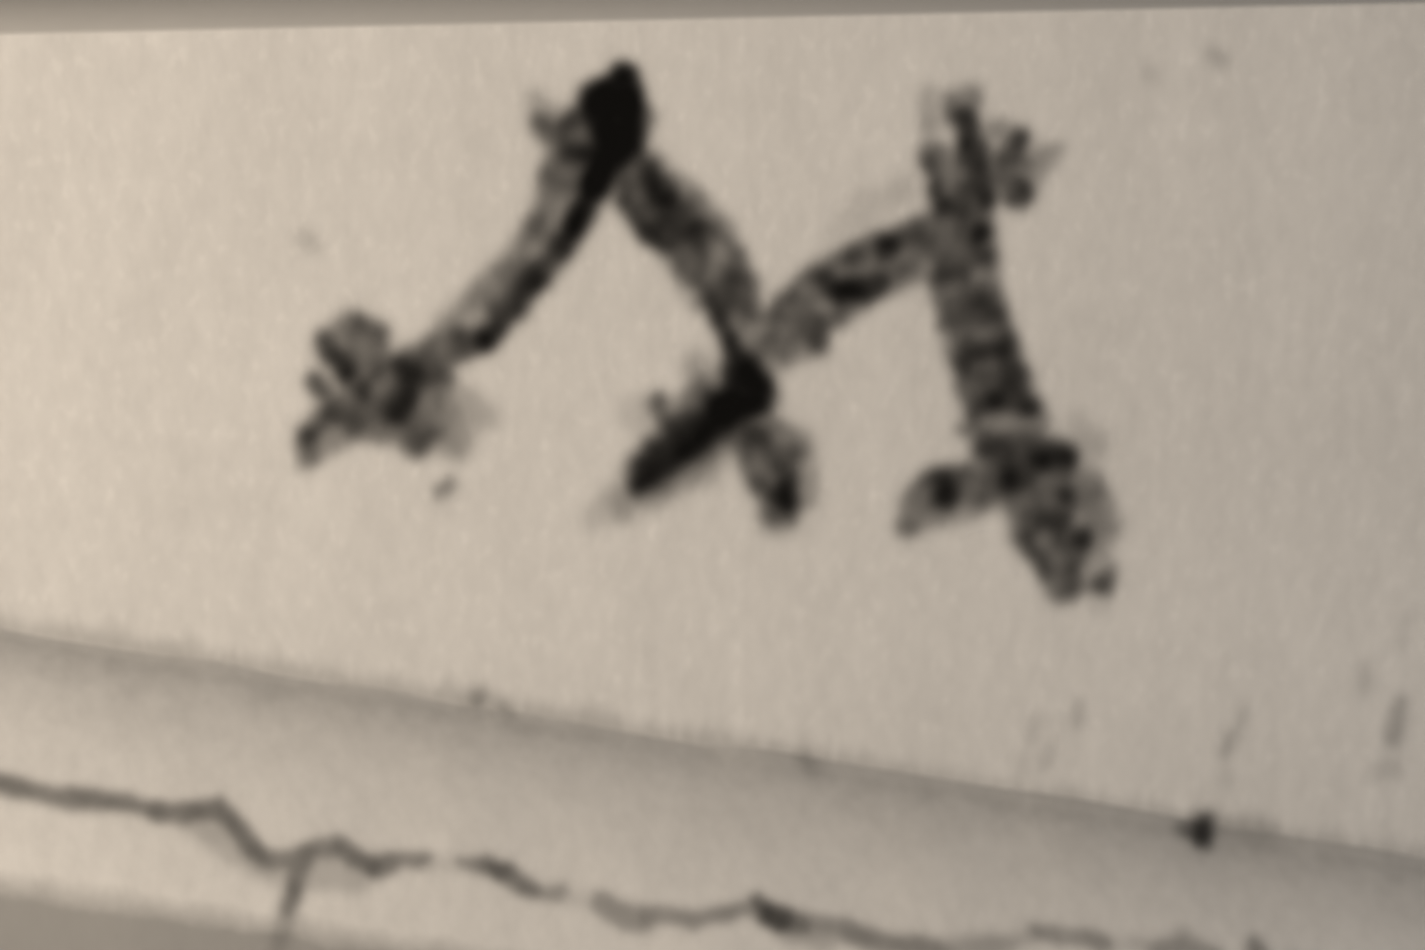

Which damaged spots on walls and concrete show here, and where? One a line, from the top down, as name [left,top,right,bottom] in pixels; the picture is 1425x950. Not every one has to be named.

crack [365,861,381,872]
crack [490,865,509,876]
crack [756,902,798,930]